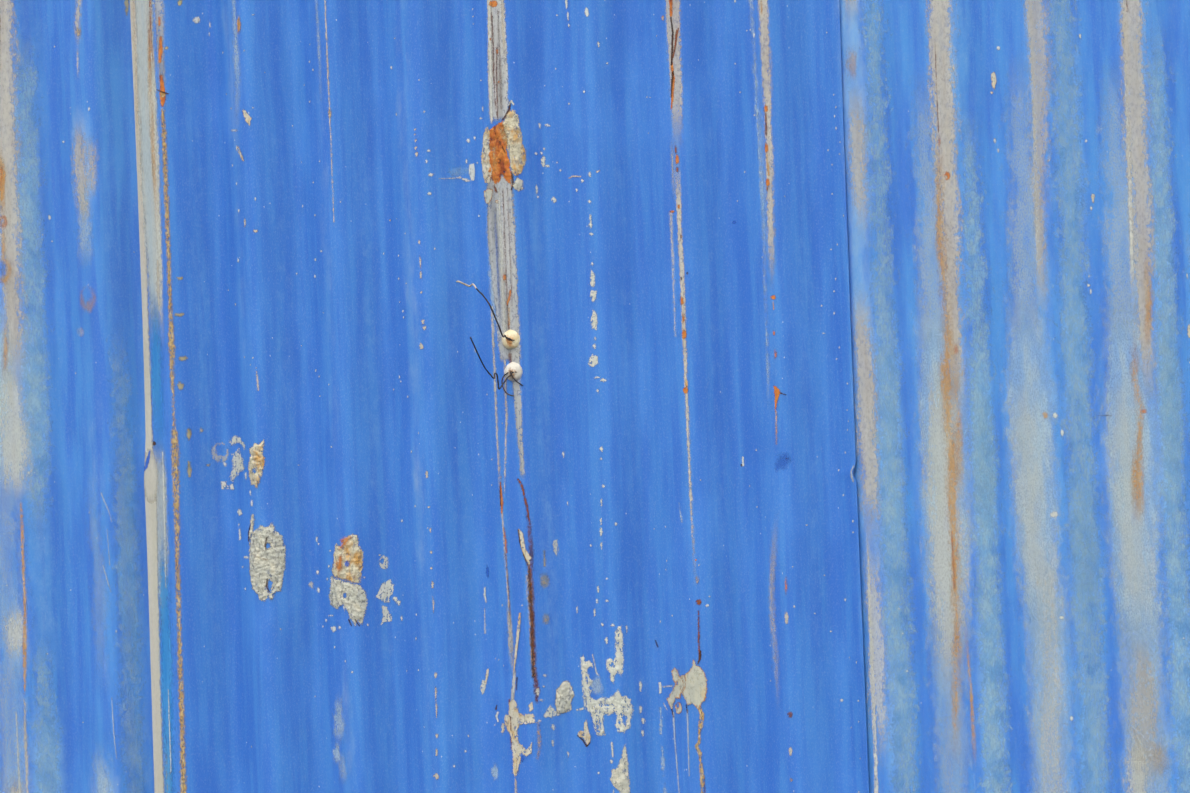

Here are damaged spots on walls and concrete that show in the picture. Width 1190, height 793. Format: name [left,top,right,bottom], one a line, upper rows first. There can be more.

corrosion [481,100,526,203]
corrosion [149,17,187,793]
peeling [212,435,253,540]
peeling [480,512,554,793]
peeling [576,654,623,763]
peeling [659,650,708,717]